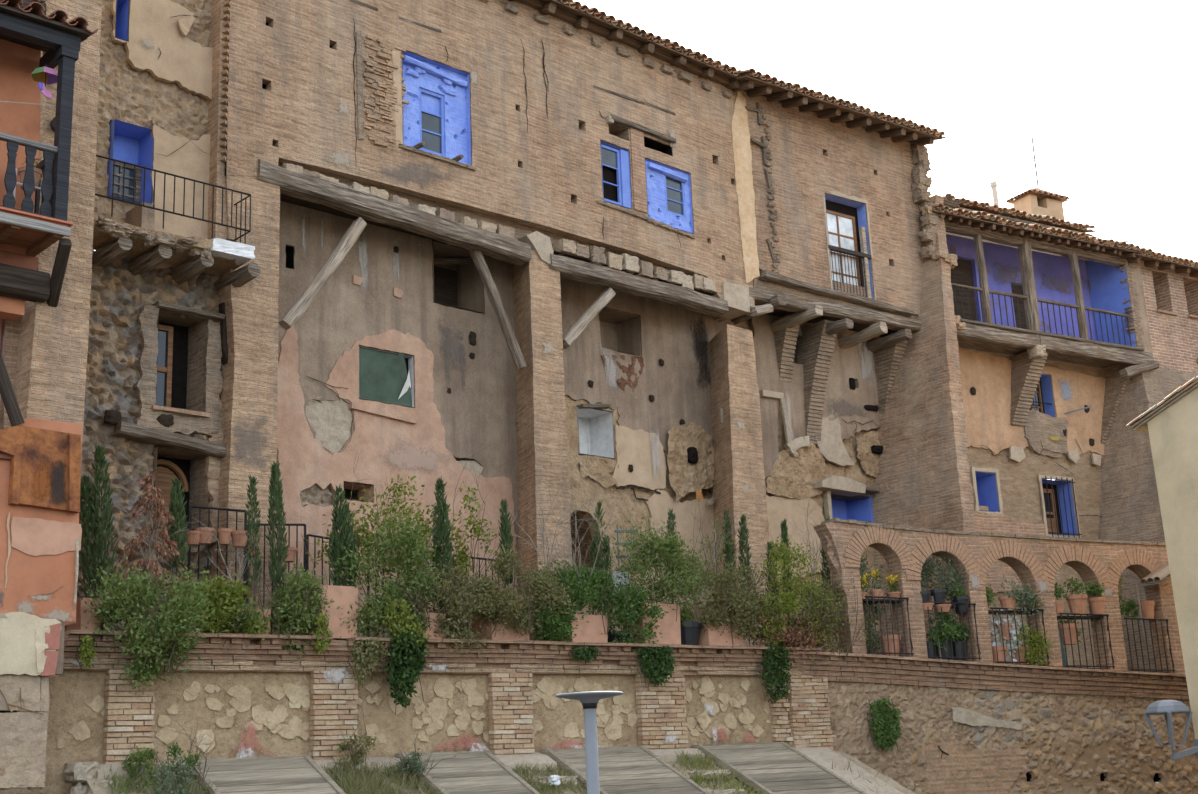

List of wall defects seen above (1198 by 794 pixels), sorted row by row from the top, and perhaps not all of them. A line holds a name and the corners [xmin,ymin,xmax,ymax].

peeling [177,15,195,37]
crack [520,38,549,133]
spalling [306,397,352,453]
spalling [687,447,698,464]
peeling [784,435,810,454]
peeling [1009,446,1025,463]
peeling [1067,438,1102,467]
rust [32,461,66,503]
spalling [580,456,633,488]
peeling [0,538,79,673]